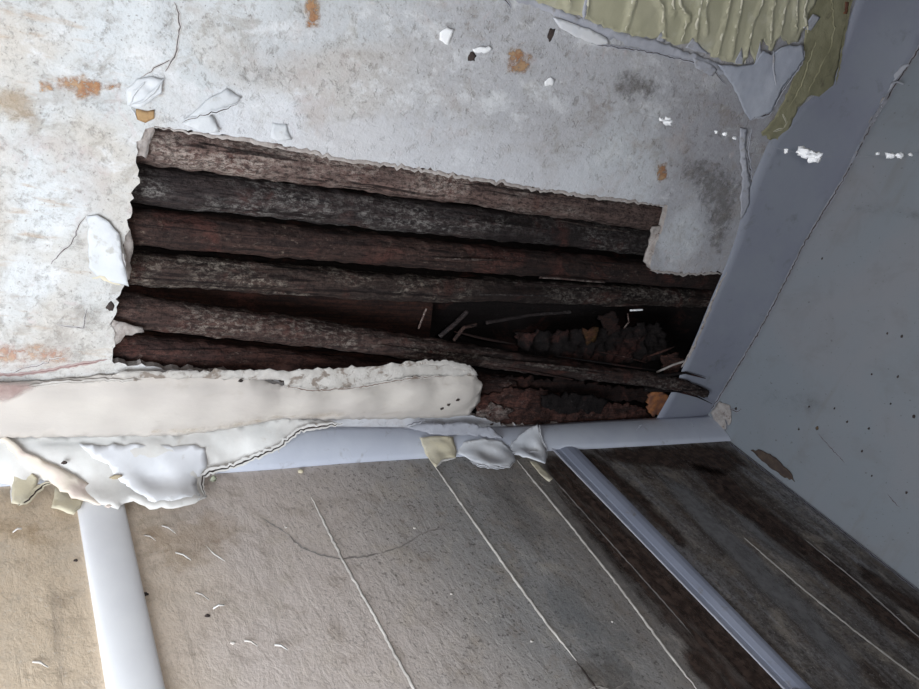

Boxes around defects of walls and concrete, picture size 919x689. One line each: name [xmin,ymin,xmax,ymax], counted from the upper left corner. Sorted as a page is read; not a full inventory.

corrosion [41,77,114,97]
crack [141,2,182,78]
corrosion [305,0,319,27]
corrosion [509,49,530,72]
peeling [503,0,853,140]
flaking render [126,77,667,207]
peeling [0,418,340,515]
peeling [407,420,553,482]
crack [262,517,444,559]
leakage [546,457,782,689]
leakage [585,444,919,648]
leakage [671,484,856,680]